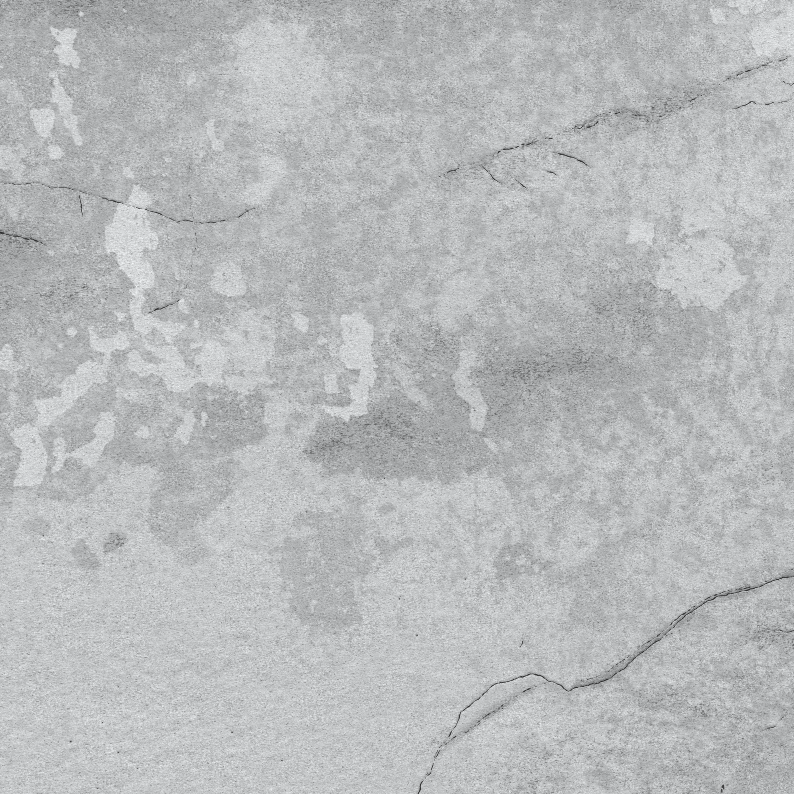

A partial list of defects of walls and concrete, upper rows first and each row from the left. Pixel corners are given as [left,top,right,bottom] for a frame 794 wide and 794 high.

crack [434,53,794,191]
crack [0,151,259,316]
crack [417,568,794,794]